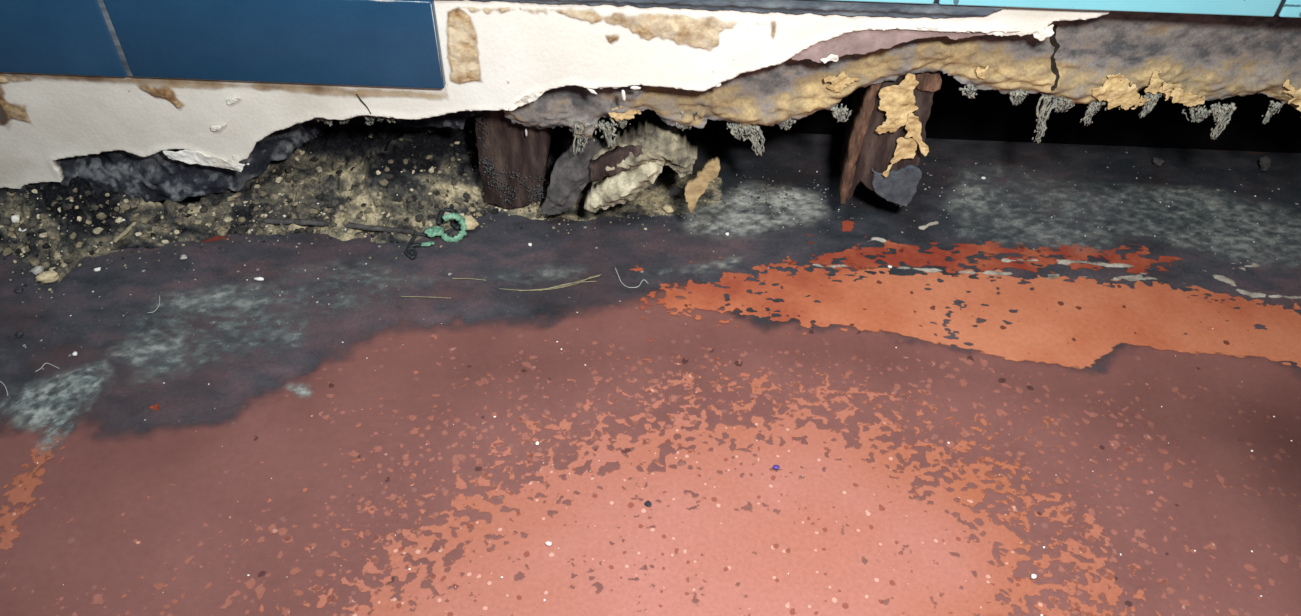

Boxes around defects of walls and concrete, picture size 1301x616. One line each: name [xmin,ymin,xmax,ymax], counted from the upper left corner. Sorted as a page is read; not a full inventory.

peeling [447,8,480,84]
spalling [503,11,1301,156]
damp [0,126,1301,450]
peeling [640,220,1301,369]
peeling [302,357,1173,616]